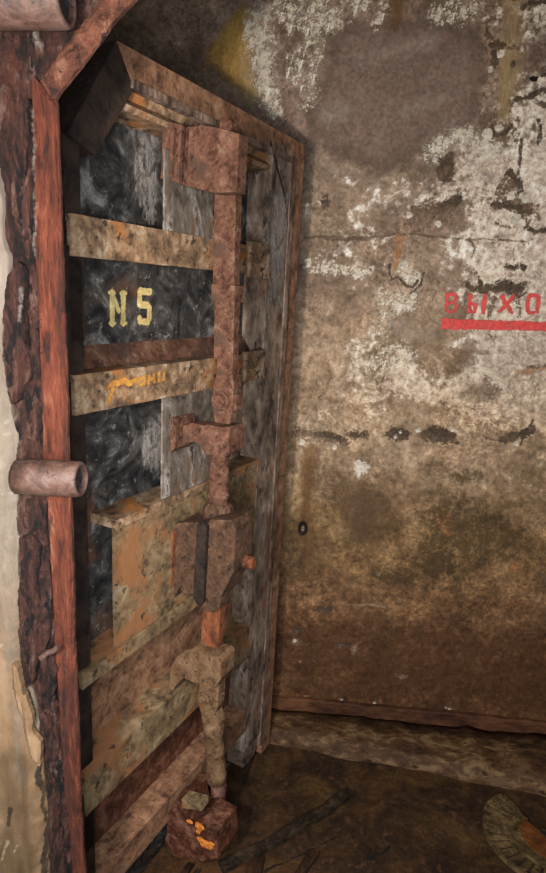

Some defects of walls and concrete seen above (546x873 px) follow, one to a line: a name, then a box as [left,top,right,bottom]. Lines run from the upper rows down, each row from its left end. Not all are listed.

damp [207,2,283,120]
damp [355,286,414,383]
damp [481,366,507,393]
damp [378,496,525,585]
spalling [12,660,44,766]